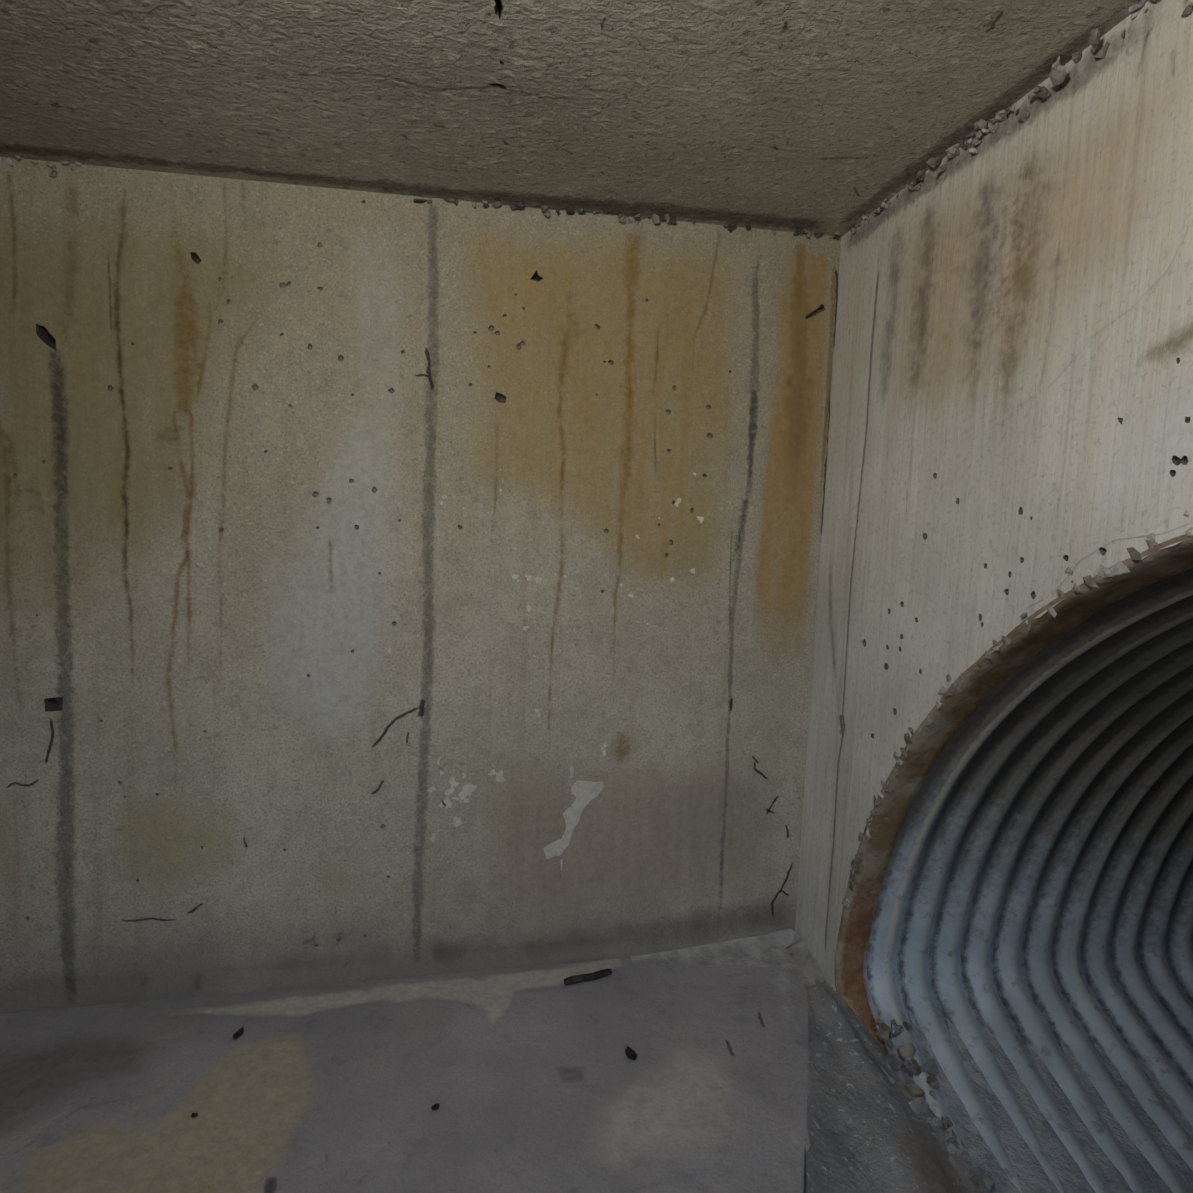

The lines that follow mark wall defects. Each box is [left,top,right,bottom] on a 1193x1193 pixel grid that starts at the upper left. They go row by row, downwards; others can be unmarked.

spalling [1181,0,1193,17]
spalling [793,0,1155,240]
spalling [413,198,524,210]
water stain [0,168,427,776]
corrosion [435,198,838,669]
crack [373,700,425,746]
water stain [0,770,55,912]
water stain [85,774,257,914]
peeling [543,766,605,879]
crack [752,756,793,915]
spalling [874,1019,994,1191]